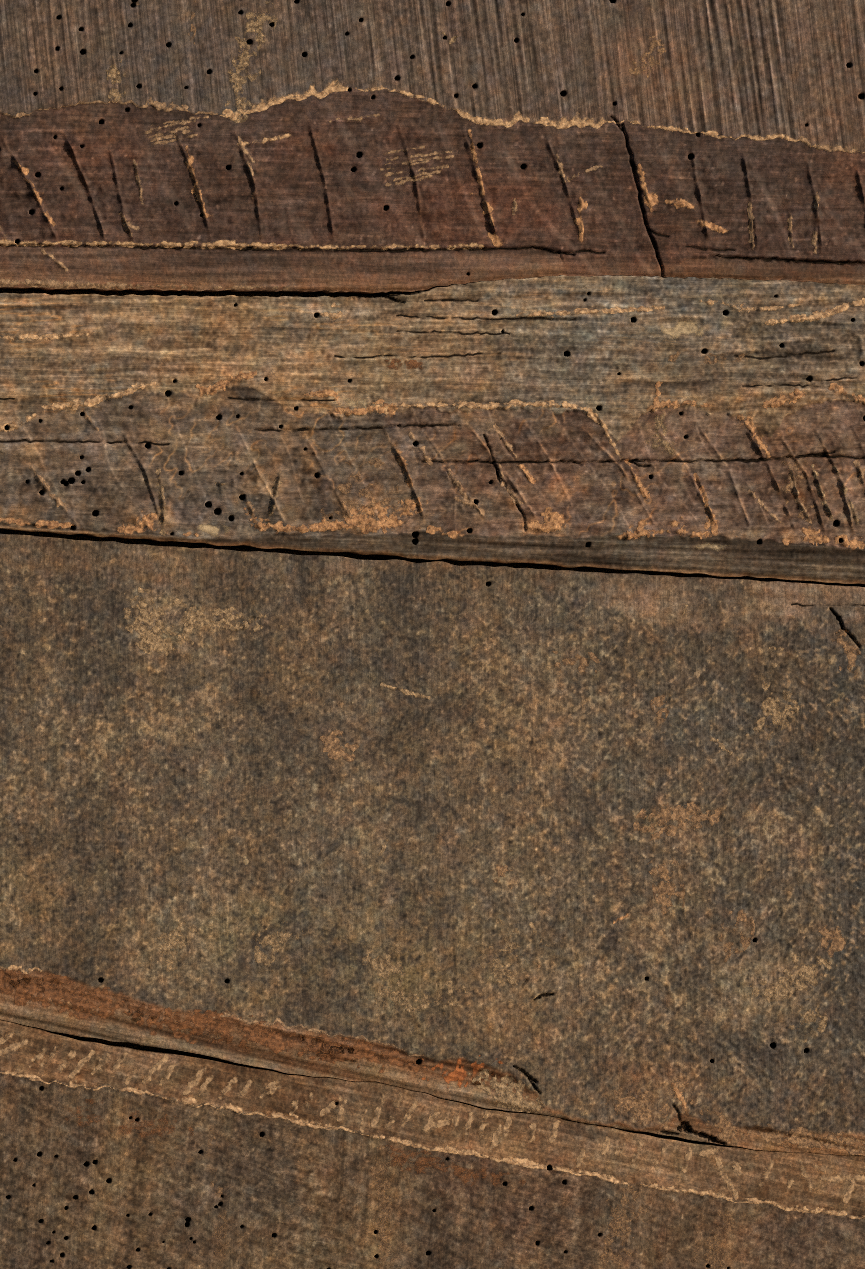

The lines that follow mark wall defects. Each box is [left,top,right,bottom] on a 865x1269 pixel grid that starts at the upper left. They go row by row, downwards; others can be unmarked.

crack [610,116,865,269]
crack [660,1104,725,1145]